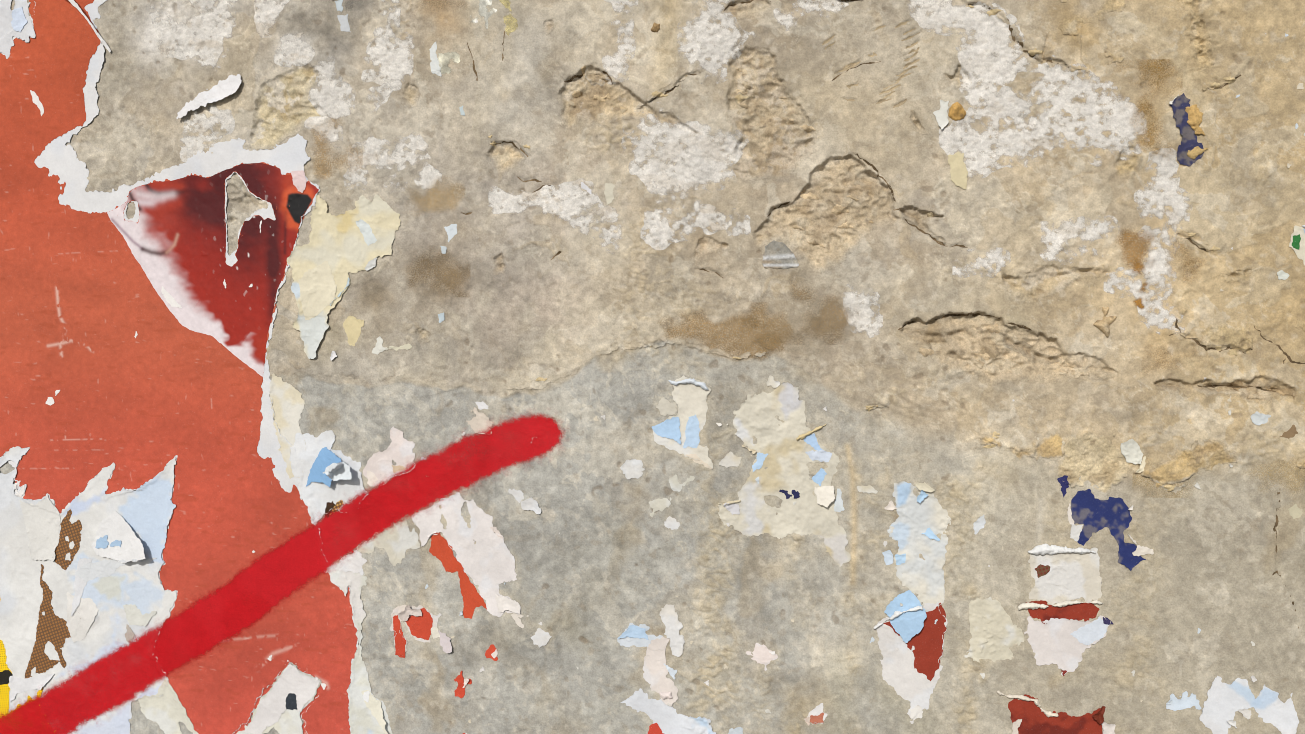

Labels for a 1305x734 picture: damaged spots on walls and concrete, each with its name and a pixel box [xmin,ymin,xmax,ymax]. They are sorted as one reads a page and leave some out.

spalling [557,0,952,273]
peeling [909,0,1261,356]
peeling [843,292,883,338]
spalling [899,311,1118,386]
crack [1169,319,1305,392]